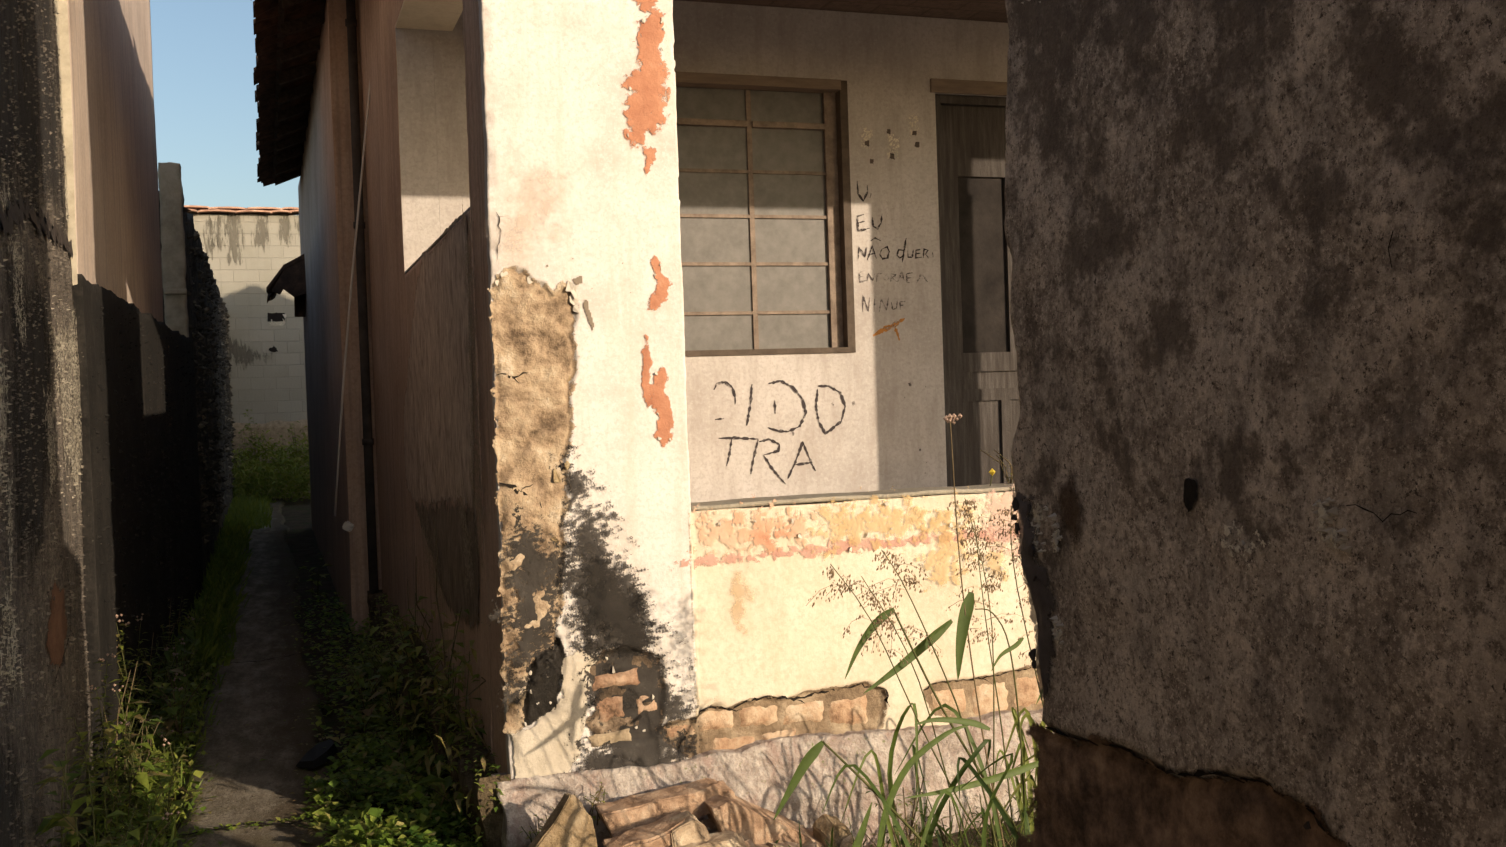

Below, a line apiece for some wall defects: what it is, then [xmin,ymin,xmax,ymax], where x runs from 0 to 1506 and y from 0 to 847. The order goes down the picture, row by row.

peeling [620,0,671,174]
peeling [641,334,674,447]
spalling [487,265,594,736]
leakage [522,538,673,727]
flaking render [586,648,887,759]
spalling [924,487,1352,847]